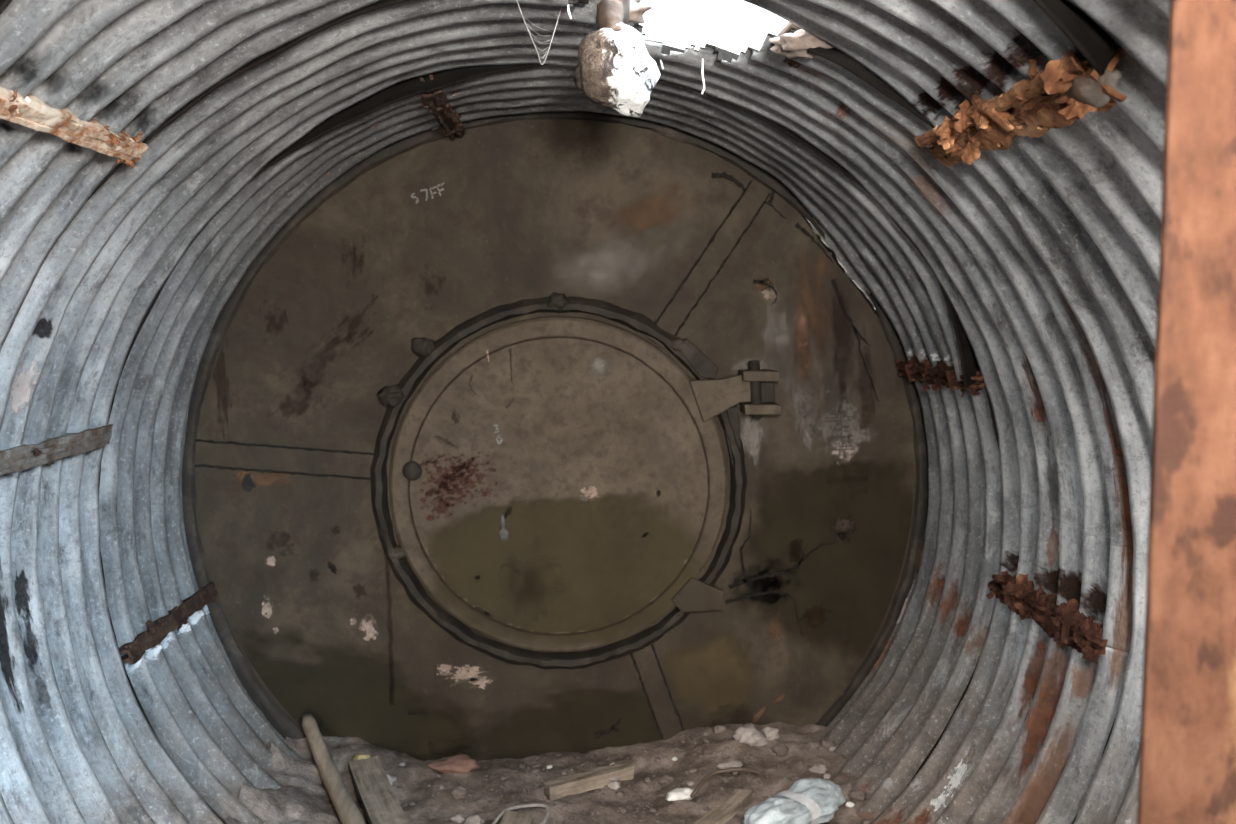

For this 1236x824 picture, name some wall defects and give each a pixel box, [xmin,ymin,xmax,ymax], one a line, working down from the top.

rust [8,86,18,115]
rust [103,124,143,169]
rust [919,89,998,164]
rust [1028,49,1097,120]
rust [904,356,983,397]
rust [419,440,497,520]
rust [986,295,1133,824]